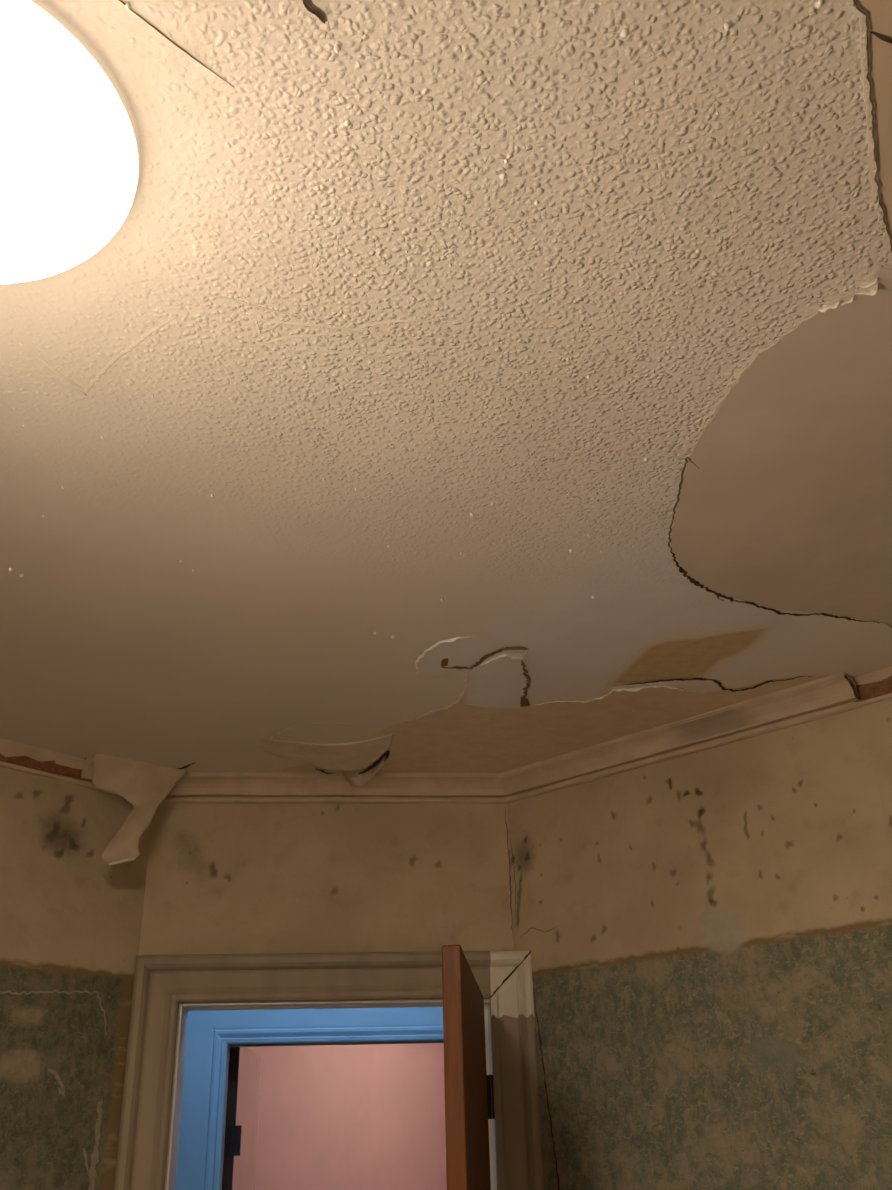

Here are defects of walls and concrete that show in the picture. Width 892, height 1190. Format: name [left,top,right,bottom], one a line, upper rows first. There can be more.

crack [117,0,234,87]
peeling [664,0,892,632]
flaking render [0,754,91,782]